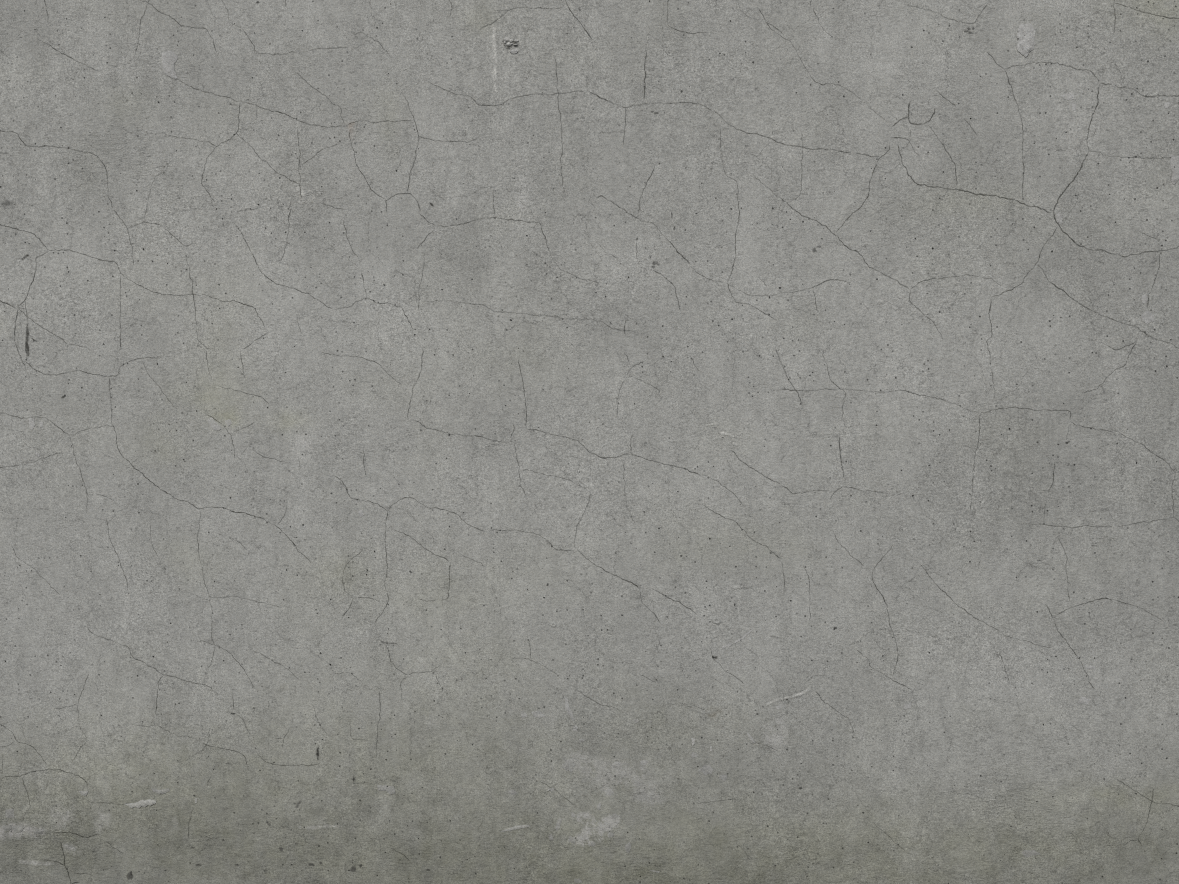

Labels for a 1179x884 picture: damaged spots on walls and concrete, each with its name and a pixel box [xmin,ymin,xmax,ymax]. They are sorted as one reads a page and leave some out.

crack [866,107,1081,247]